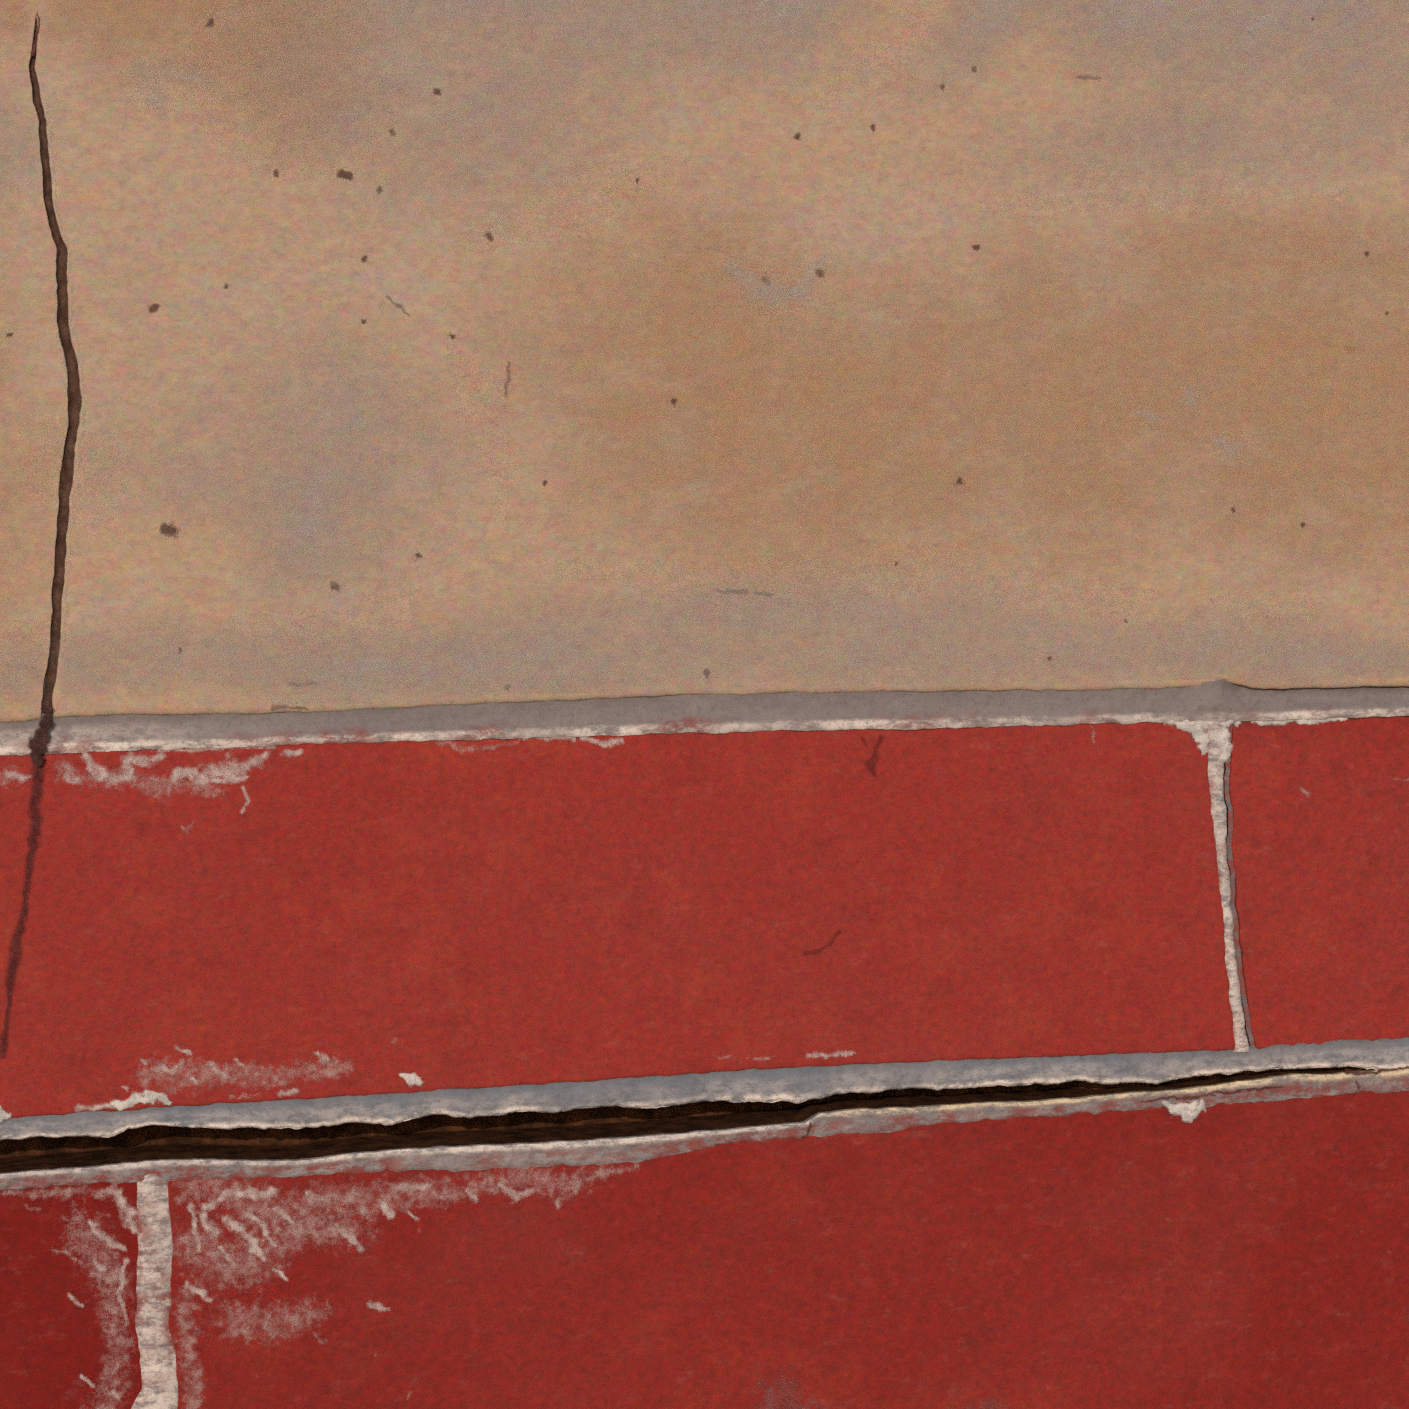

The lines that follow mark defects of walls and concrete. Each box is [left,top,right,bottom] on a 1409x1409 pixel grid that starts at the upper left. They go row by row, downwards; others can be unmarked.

crack [1,13,82,1057]
crack [0,1066,1409,1173]
efflorescence [96,1186,138,1232]
efflorescence [188,1182,363,1280]
efflorescence [304,1183,431,1219]
efflorescence [466,1178,546,1201]
efflorescence [88,1221,128,1340]
efflorescence [181,1281,211,1357]